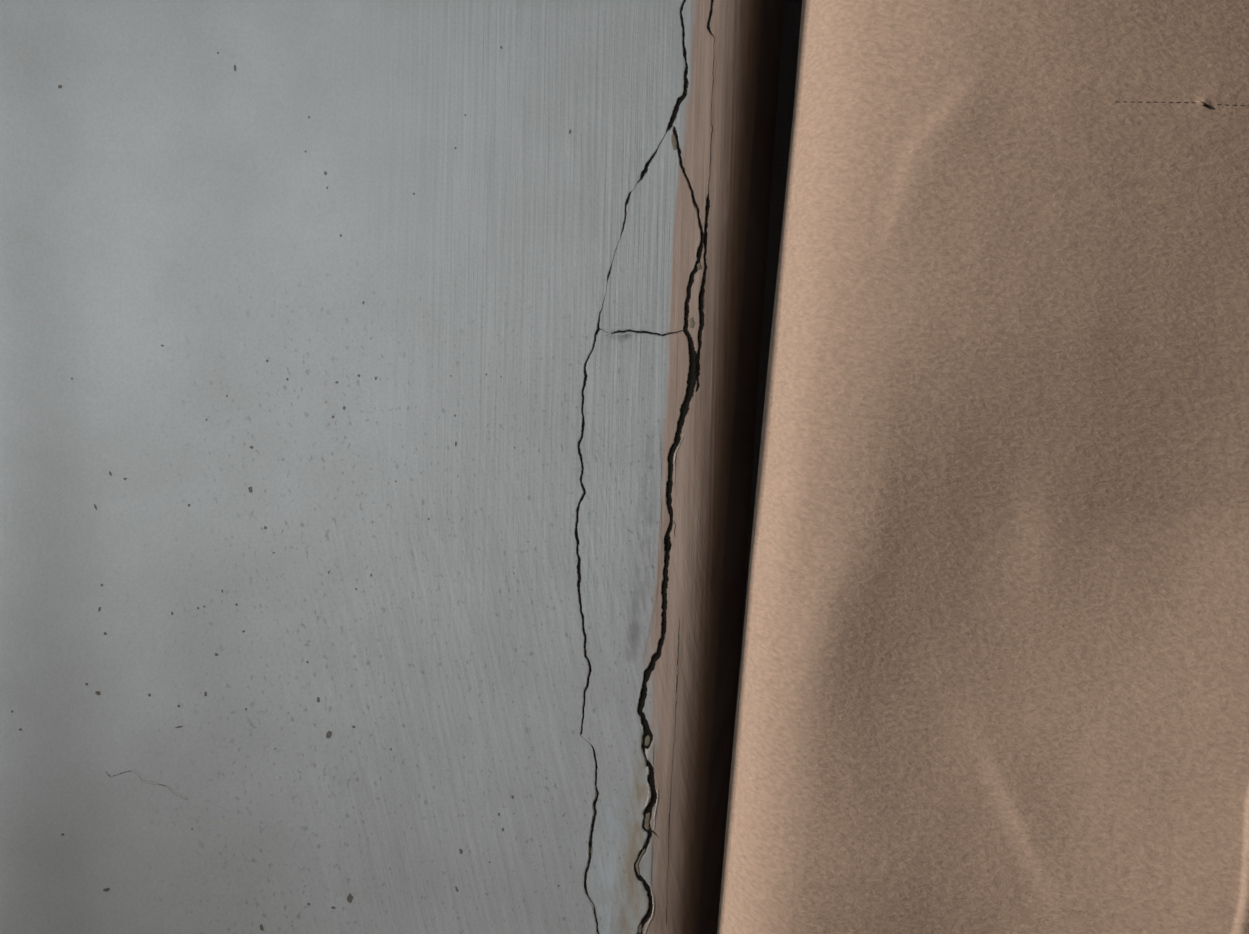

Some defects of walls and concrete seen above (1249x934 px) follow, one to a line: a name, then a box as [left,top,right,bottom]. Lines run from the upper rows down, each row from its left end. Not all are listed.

crack [575,0,715,934]